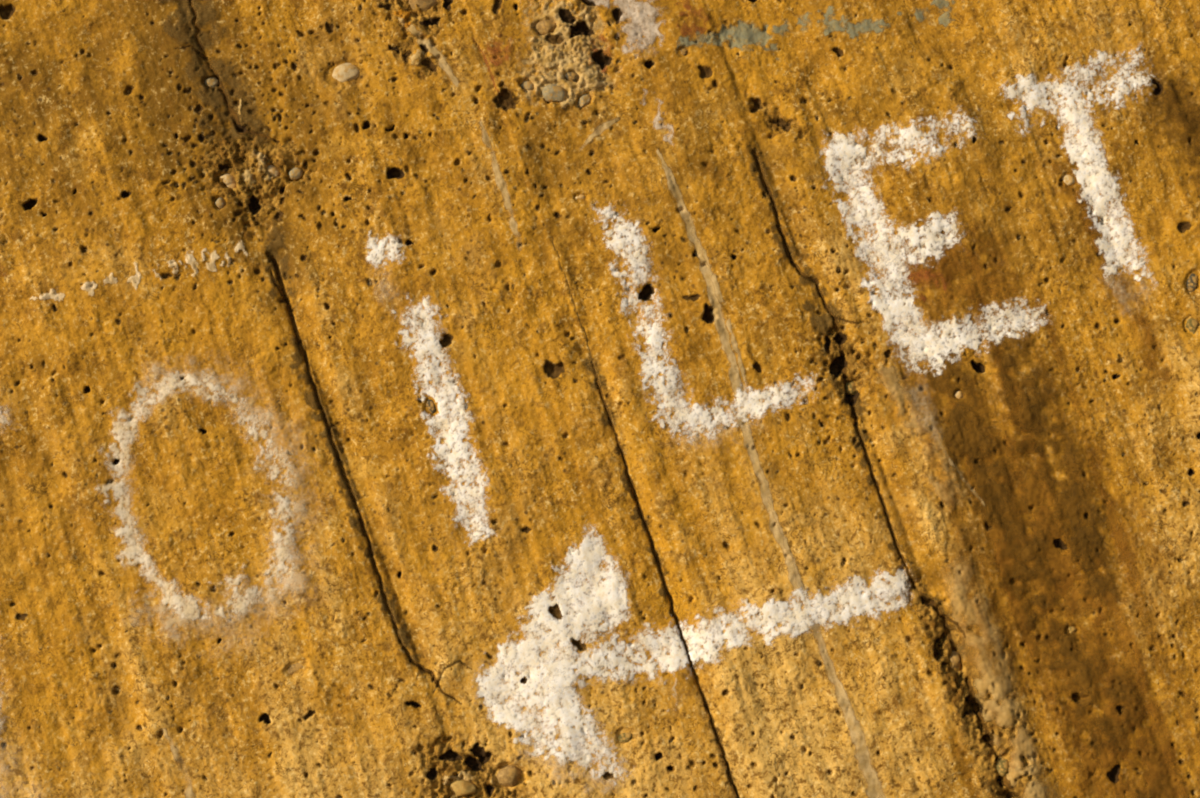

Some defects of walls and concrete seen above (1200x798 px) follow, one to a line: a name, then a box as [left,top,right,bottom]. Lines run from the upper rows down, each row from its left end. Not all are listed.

crack [265,220,472,704]
spalling [376,0,454,80]
spalling [521,0,622,109]
crack [552,237,740,798]
crack [748,145,1032,798]
water stain [902,226,1190,798]
water stain [1053,159,1169,382]
spalling [417,737,527,798]